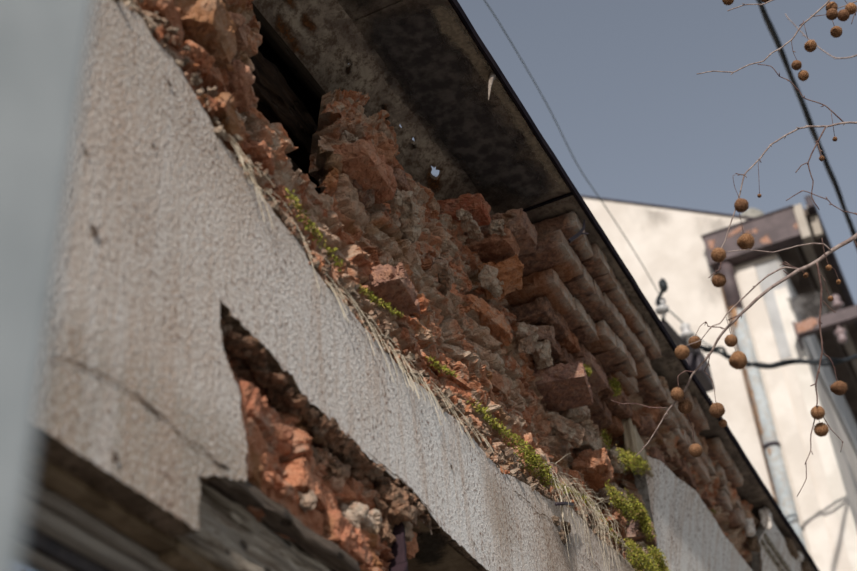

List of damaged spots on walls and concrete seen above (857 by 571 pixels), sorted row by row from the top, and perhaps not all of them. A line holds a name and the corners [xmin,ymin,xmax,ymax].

damp [372,5,566,203]
flaking render [120,0,760,571]
crack [51,354,224,471]